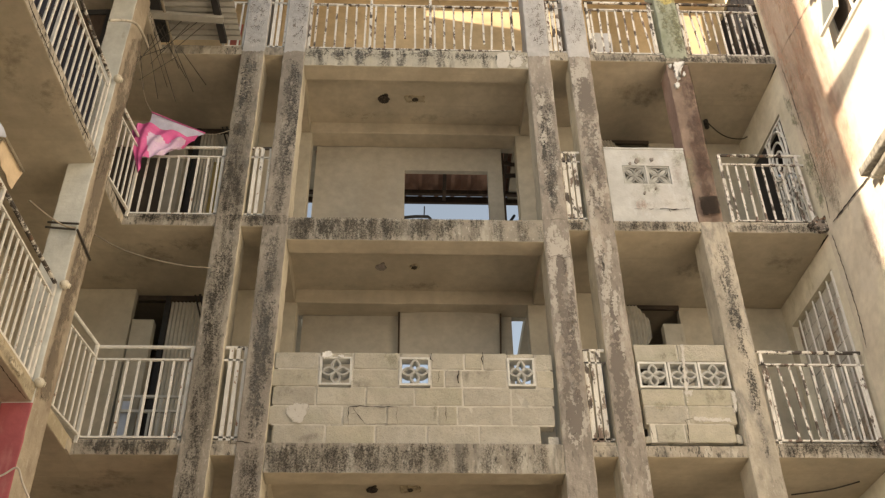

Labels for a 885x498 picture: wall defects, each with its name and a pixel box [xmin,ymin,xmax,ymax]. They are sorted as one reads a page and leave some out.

water stain [307,48,497,67]
water stain [178,124,482,498]
peeling [544,225,580,365]
peeling [593,234,621,343]
water stain [719,245,748,357]
crack [348,405,397,425]